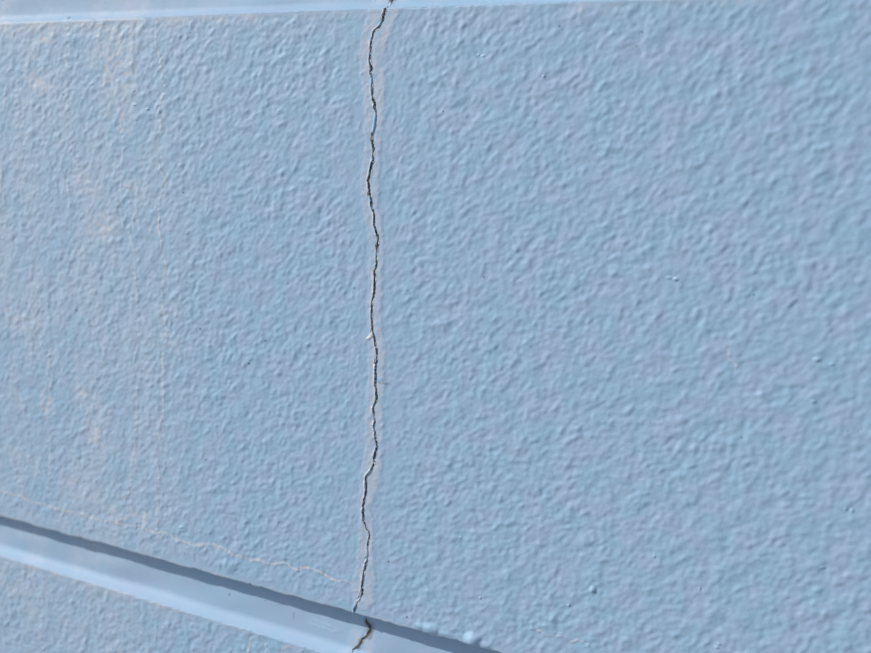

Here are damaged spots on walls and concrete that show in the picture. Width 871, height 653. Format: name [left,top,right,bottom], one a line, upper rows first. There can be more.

crack [0,0,411,653]